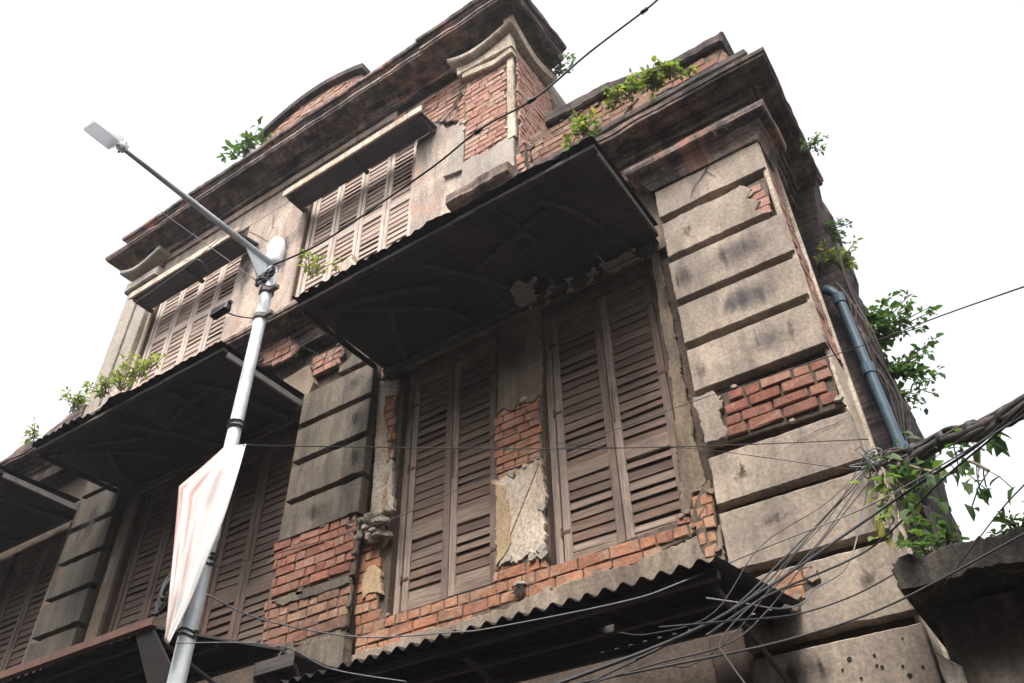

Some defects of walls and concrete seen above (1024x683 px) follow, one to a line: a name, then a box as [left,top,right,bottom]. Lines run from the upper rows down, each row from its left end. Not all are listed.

crack [689,127,728,198]
peeling [510,277,574,309]
water stain [731,288,763,306]
flaking render [717,154,847,444]
flaking render [260,379,722,655]
flaking render [776,566,821,605]